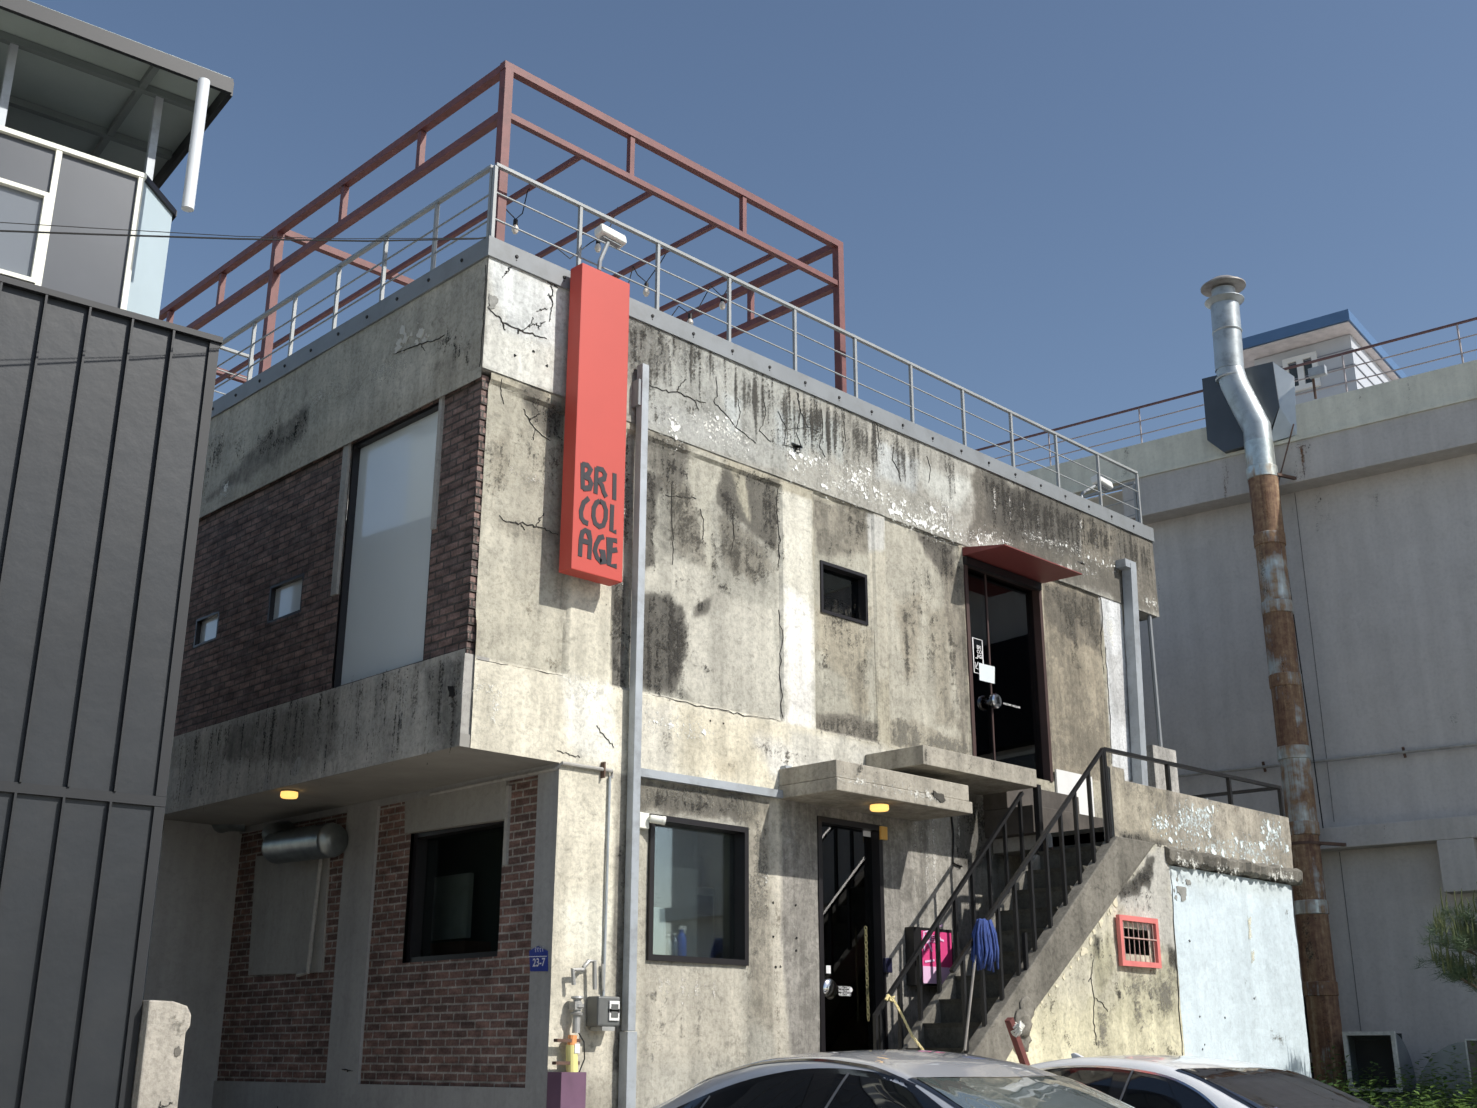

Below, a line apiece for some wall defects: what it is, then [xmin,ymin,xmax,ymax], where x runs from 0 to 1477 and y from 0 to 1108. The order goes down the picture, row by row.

crack [395,335,444,354]
crack [479,265,558,441]
leakage [624,319,921,594]
crack [499,513,558,535]
leakage [982,471,1159,607]
leakage [606,576,712,701]
leakage [1046,585,1114,669]